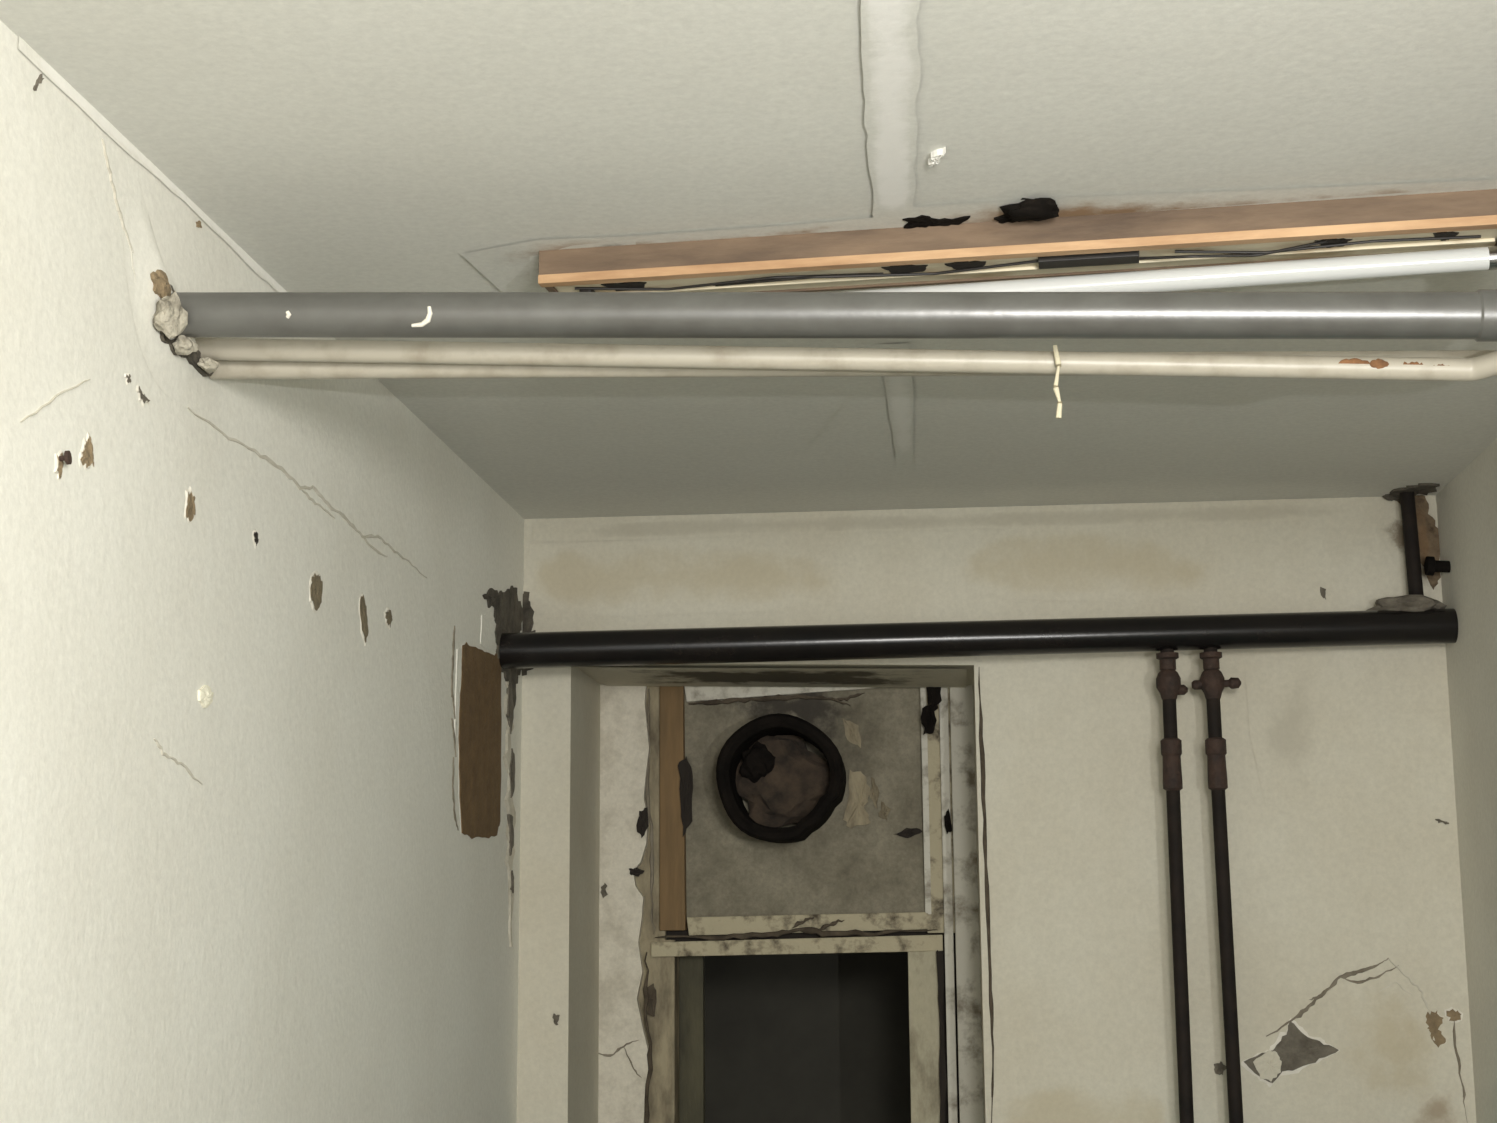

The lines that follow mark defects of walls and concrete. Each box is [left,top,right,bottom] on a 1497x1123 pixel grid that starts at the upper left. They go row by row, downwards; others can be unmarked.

flaking render [150,270,220,377]
rust [1339,358,1449,369]
crack [187,407,427,578]
flaking render [309,571,323,613]
flaking render [359,593,393,645]
flaking render [454,586,536,947]
flaking render [1214,1018,1340,1087]
crack [1266,958,1467,1120]
flaking render [1426,1007,1463,1048]